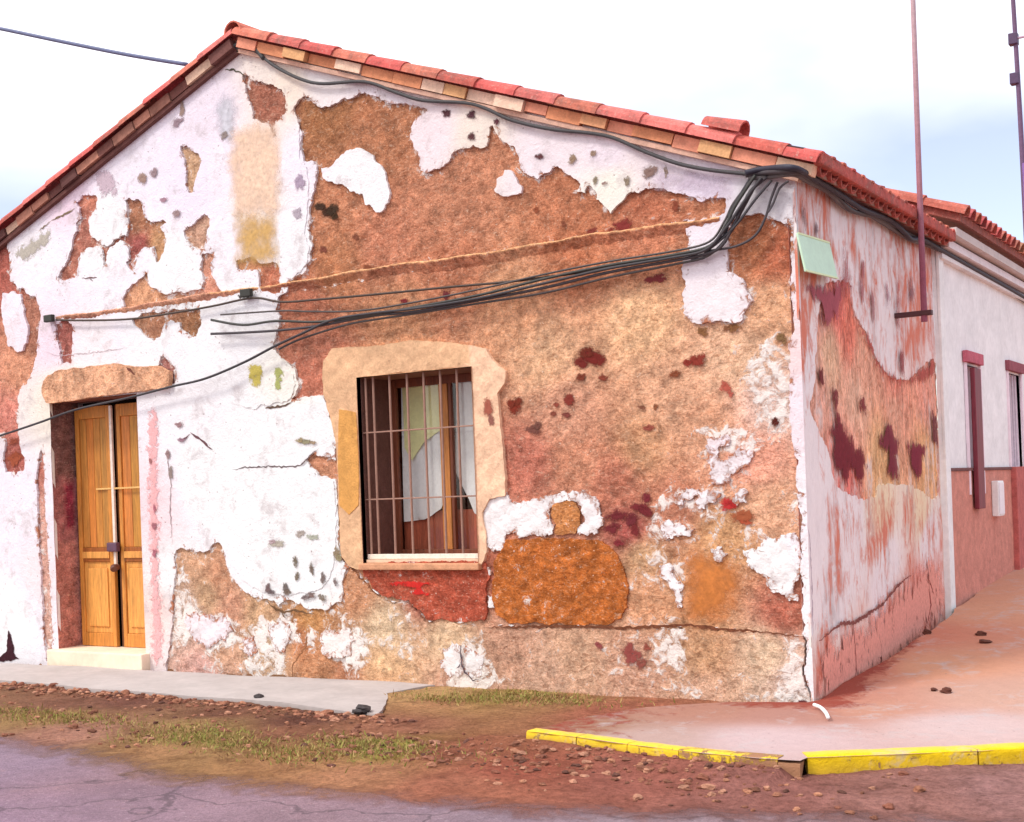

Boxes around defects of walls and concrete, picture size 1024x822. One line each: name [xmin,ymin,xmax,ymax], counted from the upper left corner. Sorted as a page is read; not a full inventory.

spalling [137,167,157,185]
peeling [0,246,41,475]
peeling [59,195,221,340]
crack [232,449,318,470]
peeling [167,75,811,702]
water stain [819,367,868,486]
water stain [807,247,935,387]
water stain [879,410,938,482]
crack [486,530,934,676]
water stain [818,556,945,699]